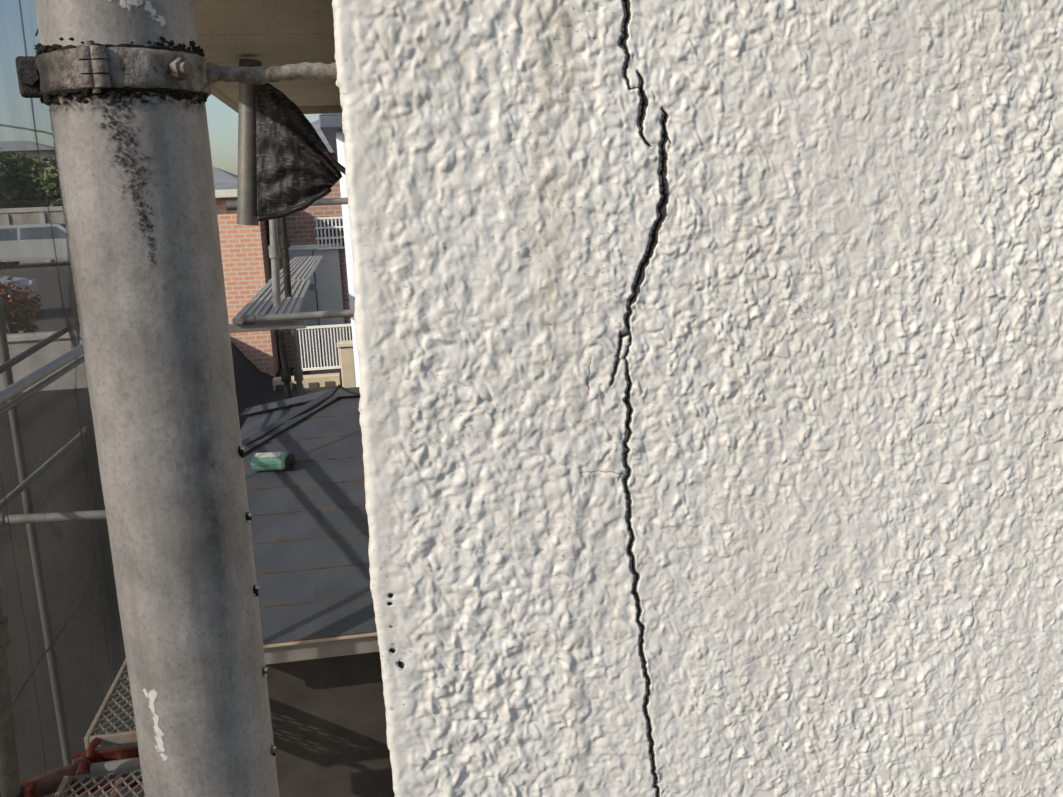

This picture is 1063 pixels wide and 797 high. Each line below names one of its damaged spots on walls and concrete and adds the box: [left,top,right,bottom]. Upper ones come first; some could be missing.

peeling [109,0,165,26]
mould [49,91,204,300]
crack [580,0,670,797]
peeling [143,689,168,761]